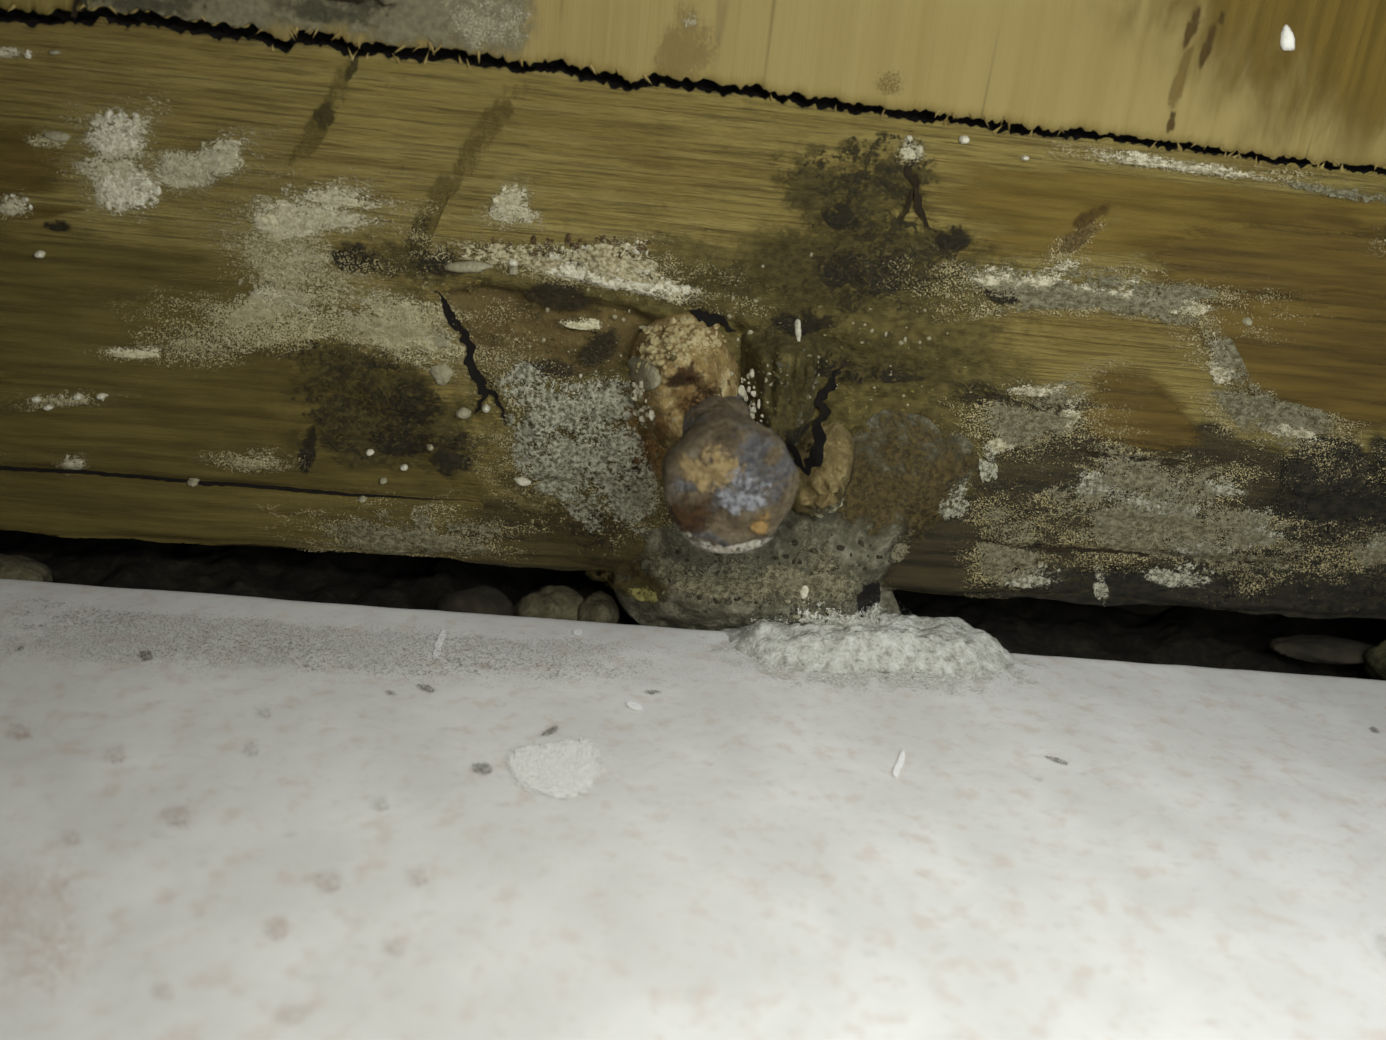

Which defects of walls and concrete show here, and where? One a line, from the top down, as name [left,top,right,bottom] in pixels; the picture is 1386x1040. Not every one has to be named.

leakage [89,0,537,53]
crack [0,0,1386,232]
crack [434,291,506,426]
leakage [0,58,1386,620]
rust [617,406,672,479]
crack [786,368,842,476]
leakage [0,599,725,695]